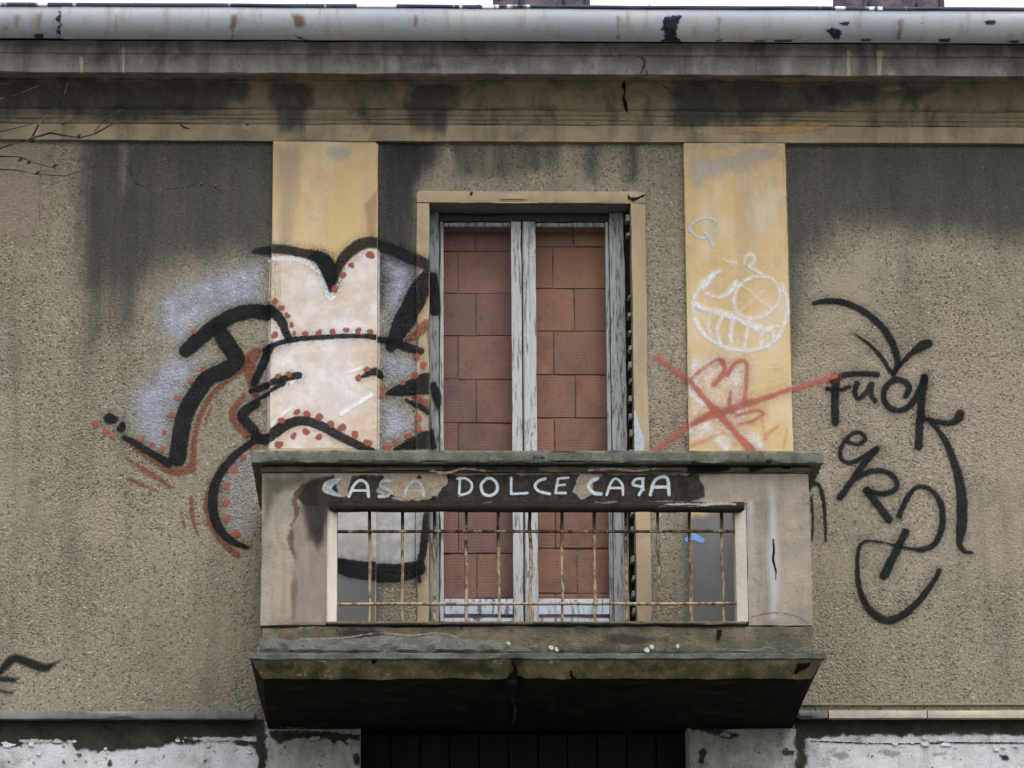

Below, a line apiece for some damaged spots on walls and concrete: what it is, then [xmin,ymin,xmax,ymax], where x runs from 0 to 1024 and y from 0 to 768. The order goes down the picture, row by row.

peeling [661,15,682,42]
peeling [826,22,850,40]
leakage [0,46,249,120]
leakage [409,83,459,130]
crack [622,56,673,112]
leakage [675,50,884,125]
leakage [91,142,273,278]
crack [770,539,778,580]
peeling [1,739,86,764]
peeling [175,736,256,762]
peeling [879,736,958,756]